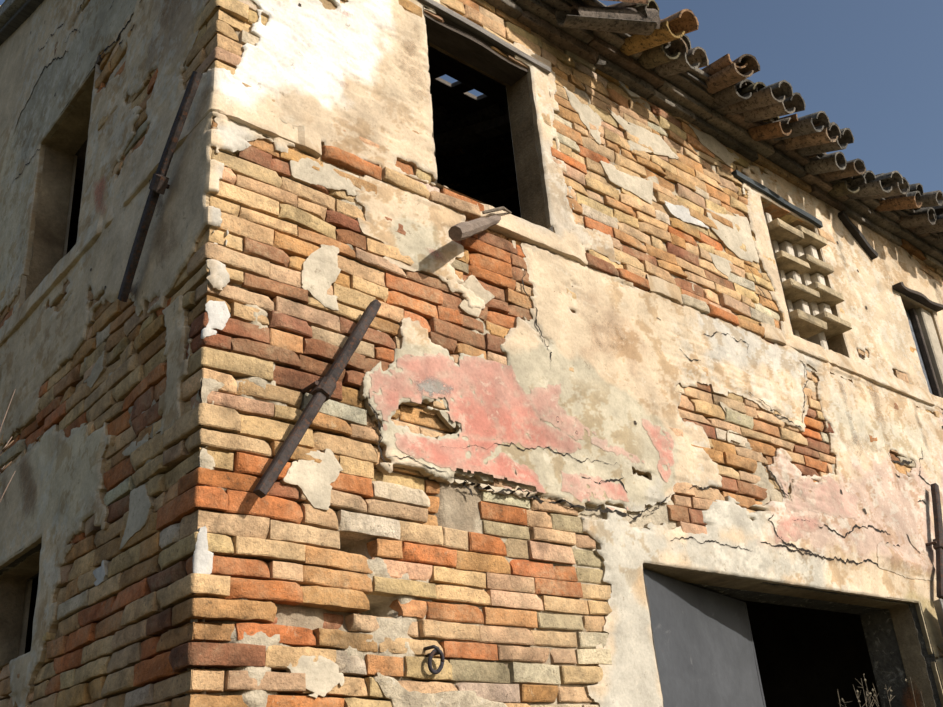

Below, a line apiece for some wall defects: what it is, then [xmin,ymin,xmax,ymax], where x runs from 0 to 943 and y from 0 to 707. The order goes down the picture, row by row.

crack [9,1,85,146]
flaking render [95,29,131,93]
crack [99,1,141,57]
flaking render [97,68,158,178]
flaking render [182,0,268,90]
flaking render [319,0,346,10]
flaking render [398,0,785,344]
flaking render [0,139,867,707]
crack [367,402,718,520]
crack [671,463,920,565]